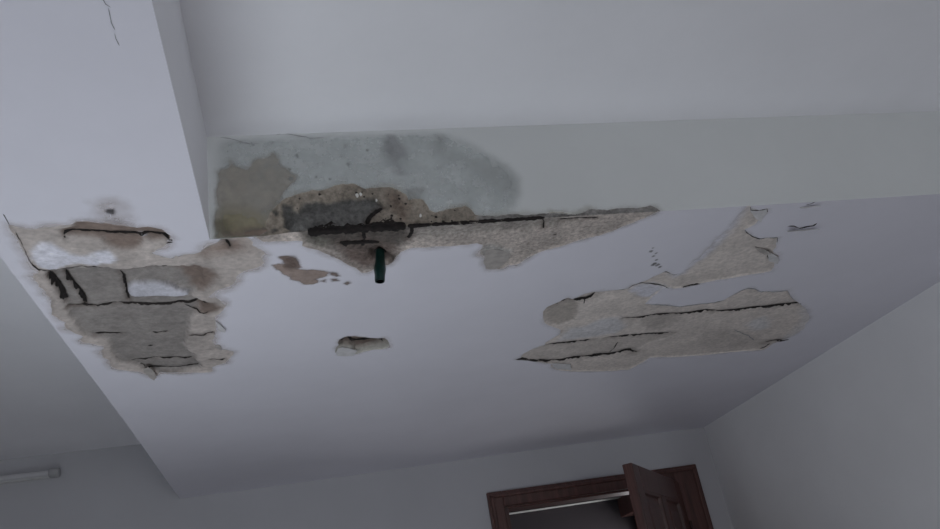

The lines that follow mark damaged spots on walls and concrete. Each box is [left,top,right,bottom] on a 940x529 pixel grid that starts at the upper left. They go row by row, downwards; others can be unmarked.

water stain [215,142,295,238]
spalling [3,184,660,380]
peeling [516,206,809,372]